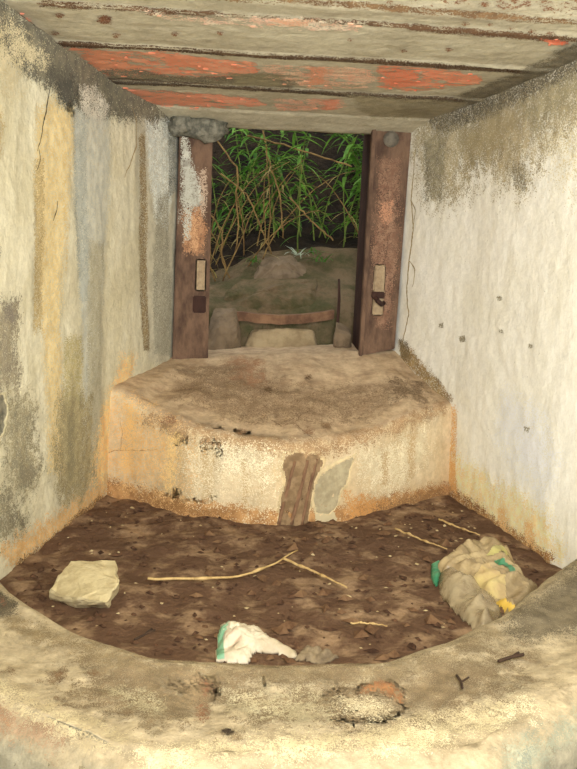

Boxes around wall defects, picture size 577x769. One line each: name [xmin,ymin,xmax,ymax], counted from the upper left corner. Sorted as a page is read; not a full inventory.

peeling [136,8,364,32]
peeling [64,47,483,111]
rust [180,204,209,256]
rust [370,155,404,330]
damp [0,1,208,553]
spalling [0,392,10,445]
rust [333,403,570,568]
peeling [0,590,19,618]